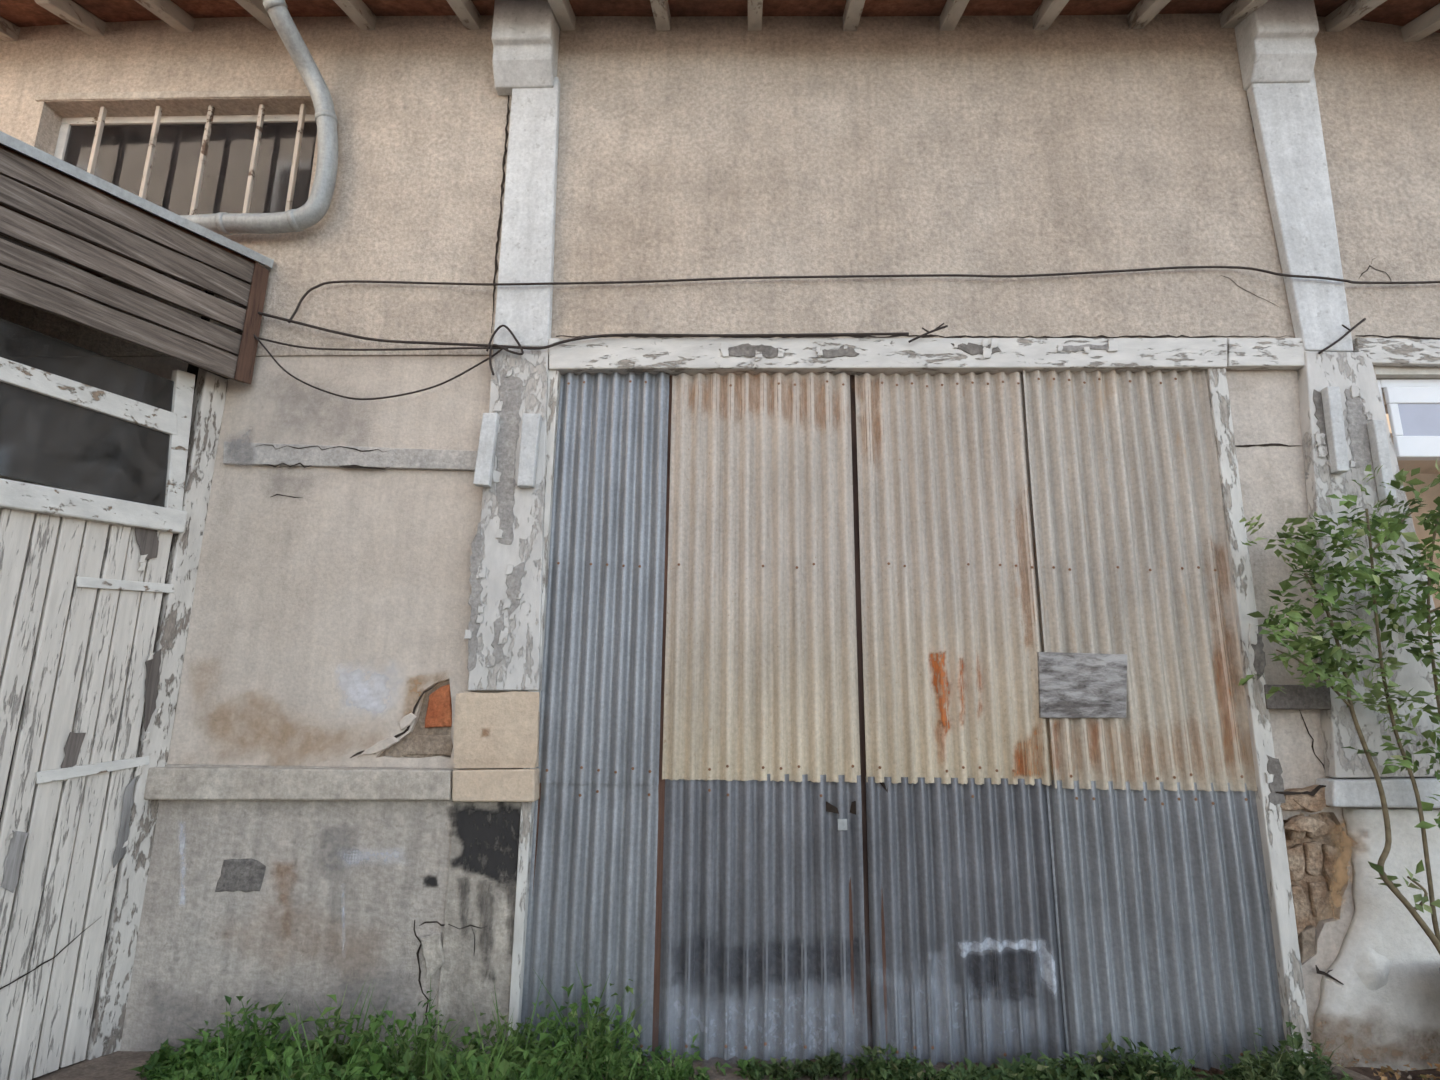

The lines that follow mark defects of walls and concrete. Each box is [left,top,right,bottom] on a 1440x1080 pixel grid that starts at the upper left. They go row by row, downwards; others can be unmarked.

peeling [719,342,788,361]
peeling [951,339,1002,359]
peeling [135,527,162,571]
peeling [464,368,525,672]
peeling [61,732,86,785]
peeling [142,649,162,742]
flaking render [357,680,453,758]
rust [929,652,981,732]
water stain [424,876,438,887]
water stain [450,802,521,980]
flaking render [1265,755,1342,963]
crack [413,920,482,1023]